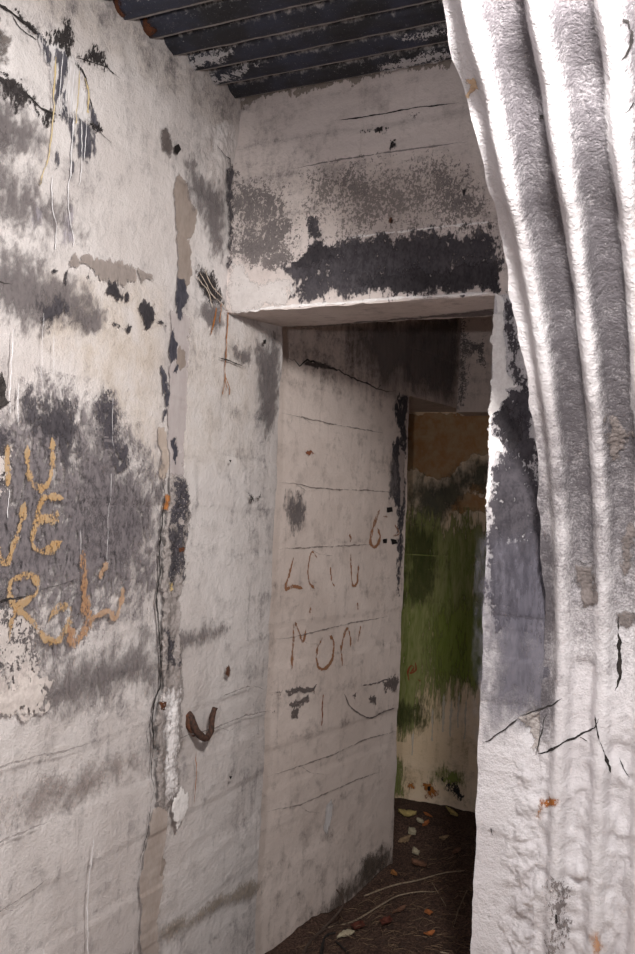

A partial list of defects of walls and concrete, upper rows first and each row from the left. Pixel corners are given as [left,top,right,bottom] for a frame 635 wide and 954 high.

spalling [0,18,12,63]
crack [0,71,61,128]
crack [0,4,117,108]
leakage [15,8,108,249]
peeling [189,44,260,85]
leakage [173,173,229,328]
spalling [0,372,10,412]
peeling [0,445,13,500]
crack [0,579,76,602]
peeling [0,605,55,722]
crack [139,472,168,865]
crack [483,700,628,776]